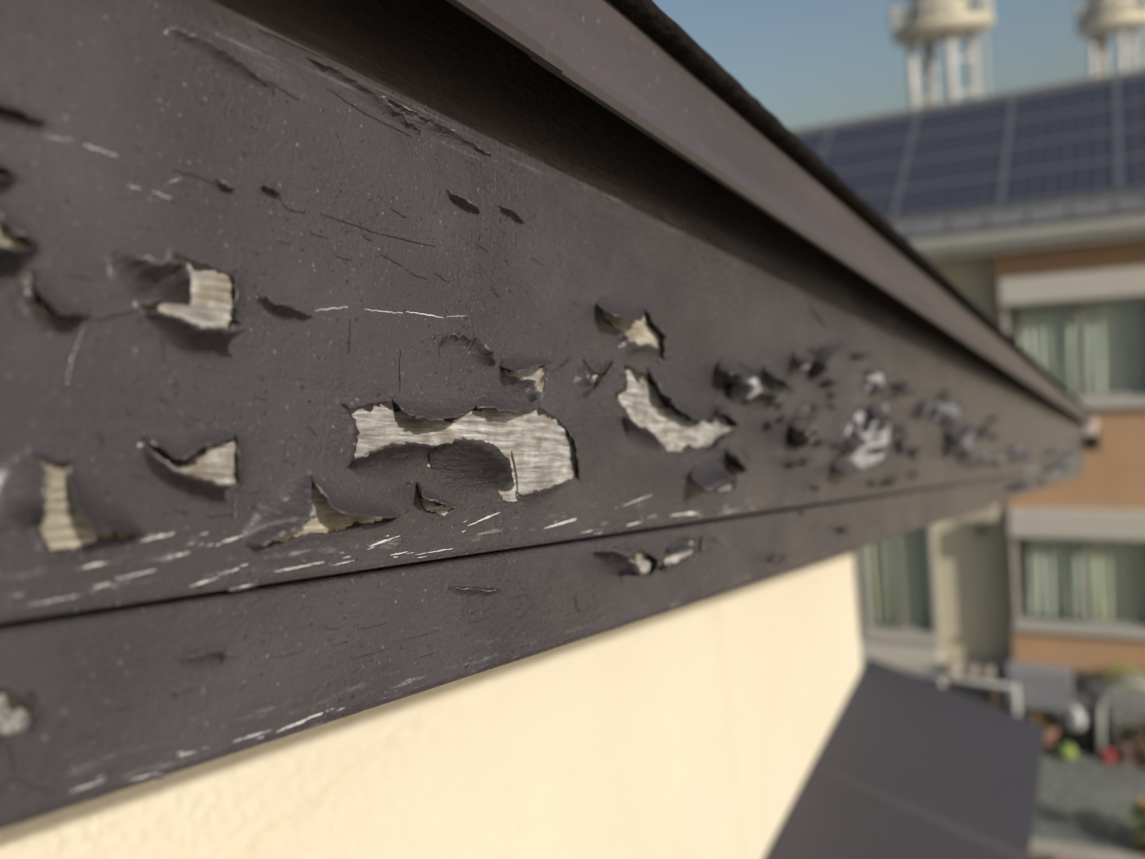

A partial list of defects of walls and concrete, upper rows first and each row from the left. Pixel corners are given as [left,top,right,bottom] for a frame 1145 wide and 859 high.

peeling [0,153,47,289]
peeling [108,245,313,365]
peeling [0,283,1000,565]
peeling [594,534,719,579]
peeling [0,679,58,799]